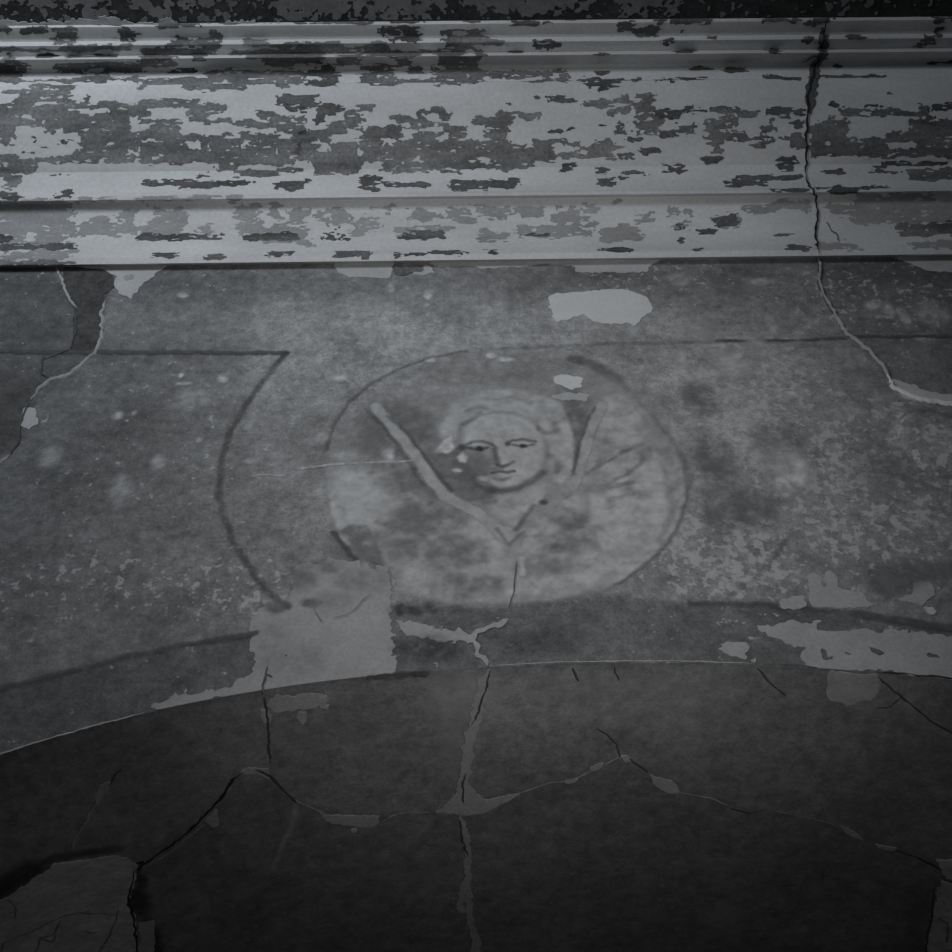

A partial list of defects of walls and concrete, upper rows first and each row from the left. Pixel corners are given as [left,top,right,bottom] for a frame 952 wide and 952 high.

peeling [0,0,952,350]
crack [803,19,952,406]
flaking render [20,407,38,430]
crack [1,666,321,952]
flaking render [0,557,470,754]
crack [456,560,518,952]
crack [518,728,651,794]
flaking render [492,641,756,666]
crack [758,664,818,696]
flaking render [757,570,952,706]
crack [878,672,952,733]
flaking render [0,855,156,952]